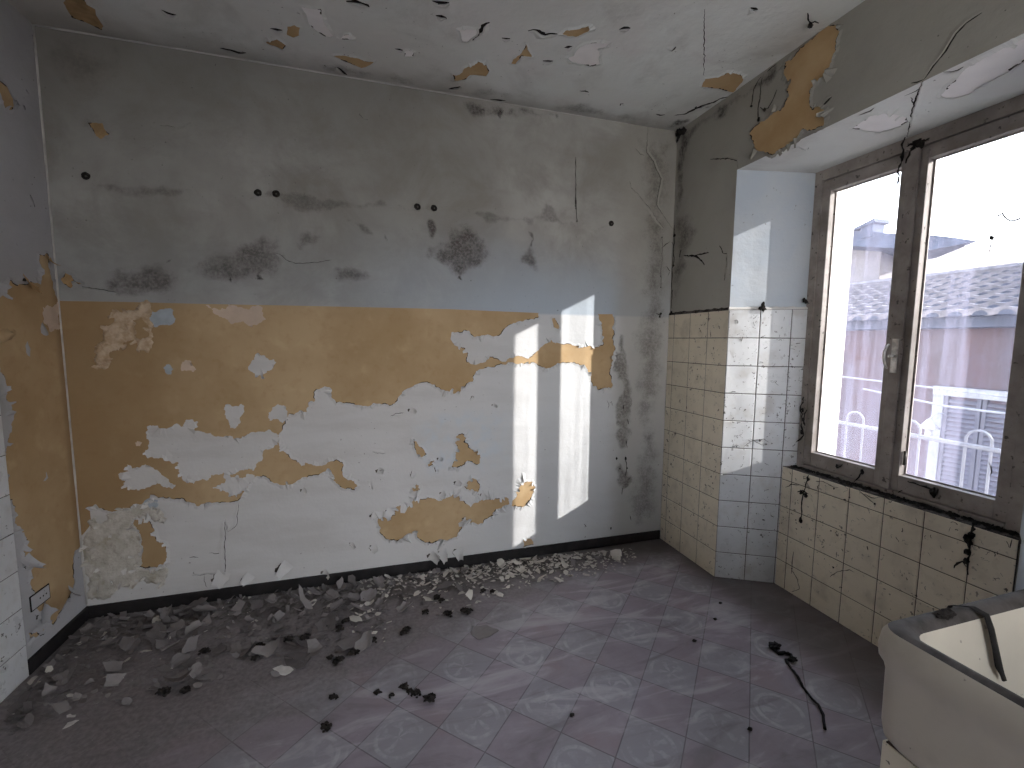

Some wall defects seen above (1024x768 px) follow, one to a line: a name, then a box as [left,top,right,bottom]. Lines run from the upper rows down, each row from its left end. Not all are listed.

peeling [58,0,108,34]
peeling [450,59,492,83]
peeling [558,23,611,68]
peeling [699,70,748,93]
peeling [748,20,844,160]
crack [905,9,982,137]
peeling [936,35,1024,100]
peeling [848,108,911,134]
mould [437,229,482,280]
peeling [0,250,617,647]